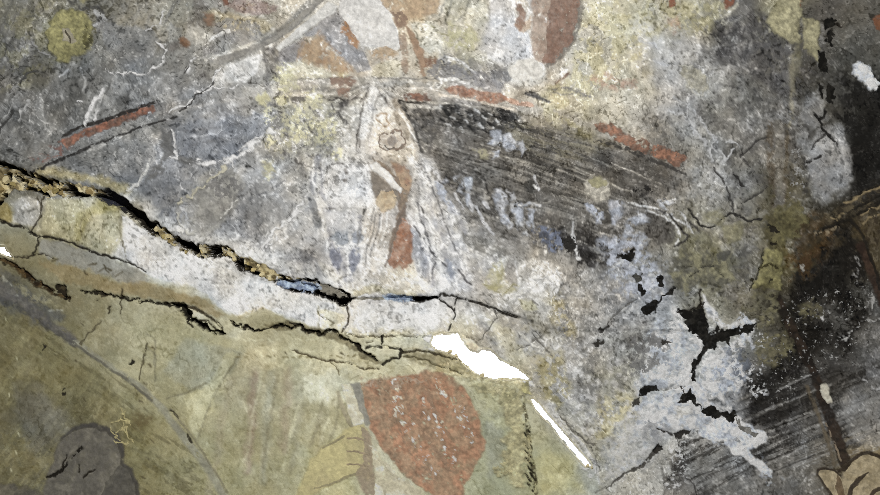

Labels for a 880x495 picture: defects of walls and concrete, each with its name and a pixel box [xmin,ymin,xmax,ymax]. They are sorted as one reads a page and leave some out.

crack [688,167,763,228]
crack [0,161,519,380]
spalling [423,332,534,386]
peeling [632,289,880,437]
spalling [529,397,594,478]